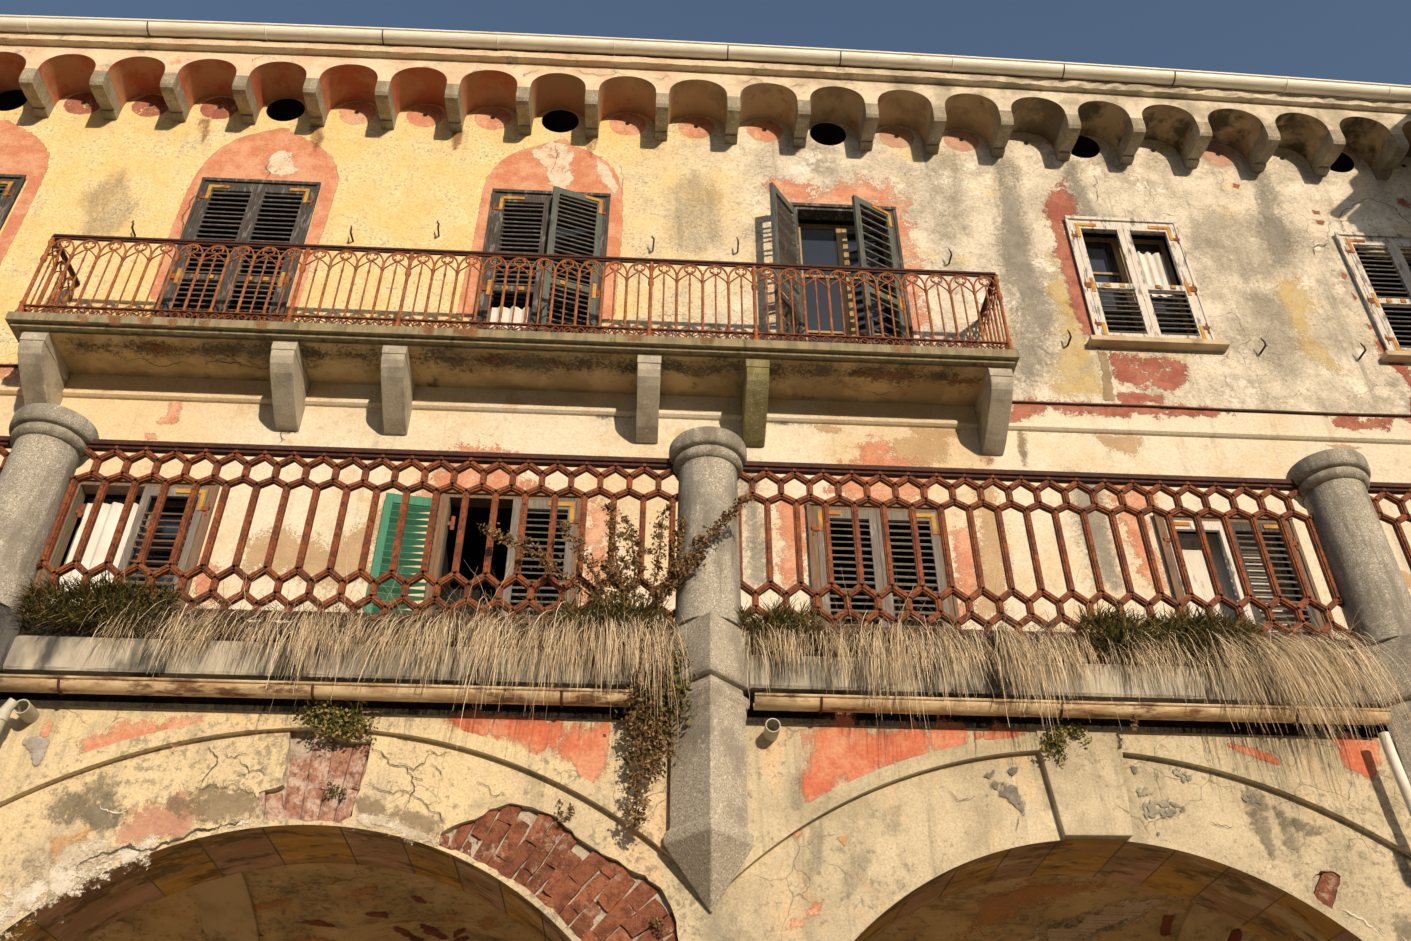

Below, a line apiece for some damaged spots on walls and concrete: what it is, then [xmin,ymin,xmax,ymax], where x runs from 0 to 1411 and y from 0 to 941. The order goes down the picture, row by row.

peeling [532,141,575,189]
crack [1313,198,1411,254]
peeling [1041,255,1189,404]
peeling [1325,323,1411,433]
spalling [259,730,372,830]
crack [365,749,447,820]
peeling [444,710,610,783]
peeling [786,713,1029,803]
peeling [1333,733,1382,779]
water stain [0,771,159,940]
spalling [439,803,679,941]
spalling [1311,871,1341,909]